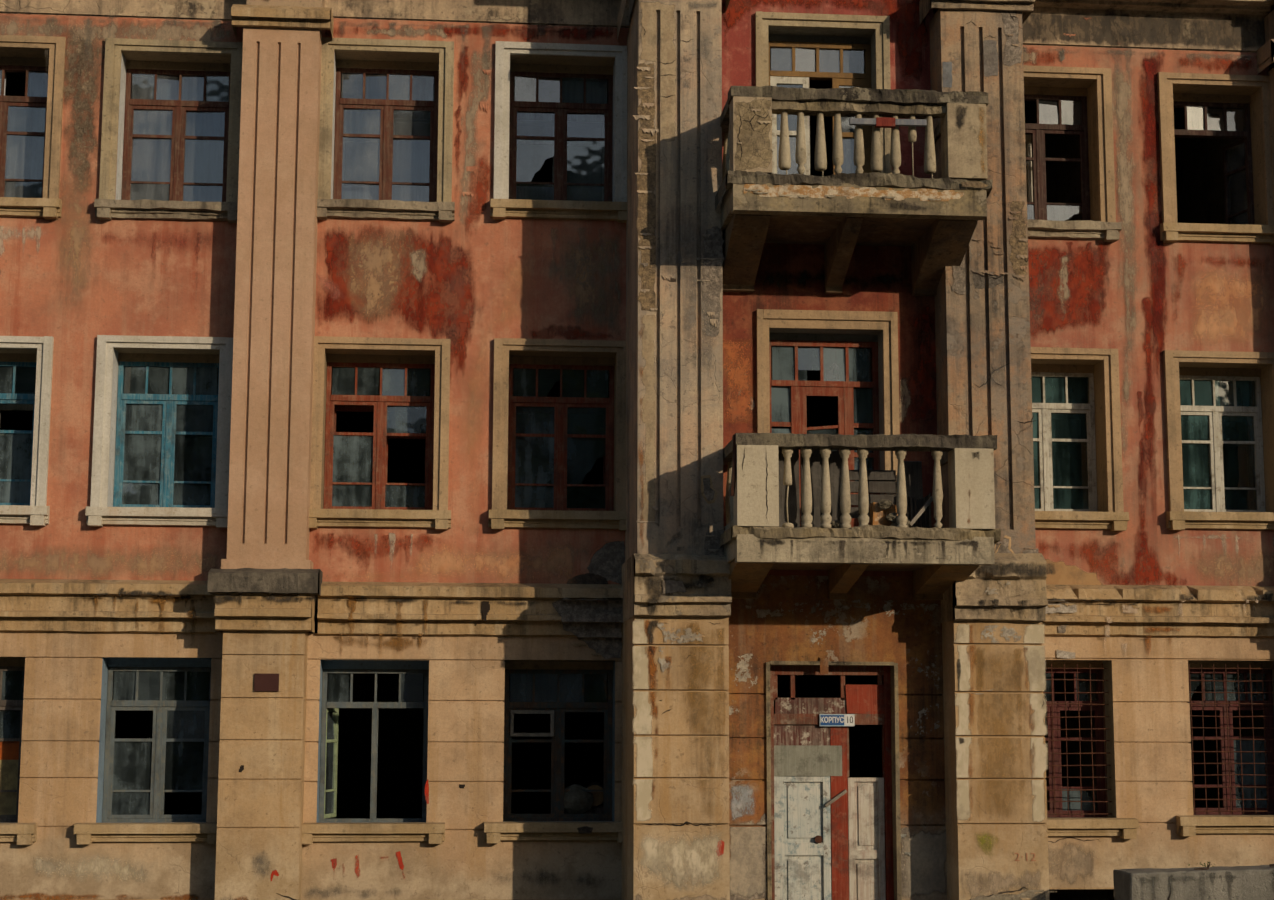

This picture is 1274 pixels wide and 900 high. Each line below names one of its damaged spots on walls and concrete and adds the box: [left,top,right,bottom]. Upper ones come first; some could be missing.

peeling [743,181,988,201]
peeling [633,63,676,536]
peeling [686,226,724,366]
peeling [551,538,625,660]
peeling [657,621,718,672]
peeling [731,653,757,688]
leakage [979,541,1140,640]
leakage [954,624,1048,822]
leakage [902,831,947,897]